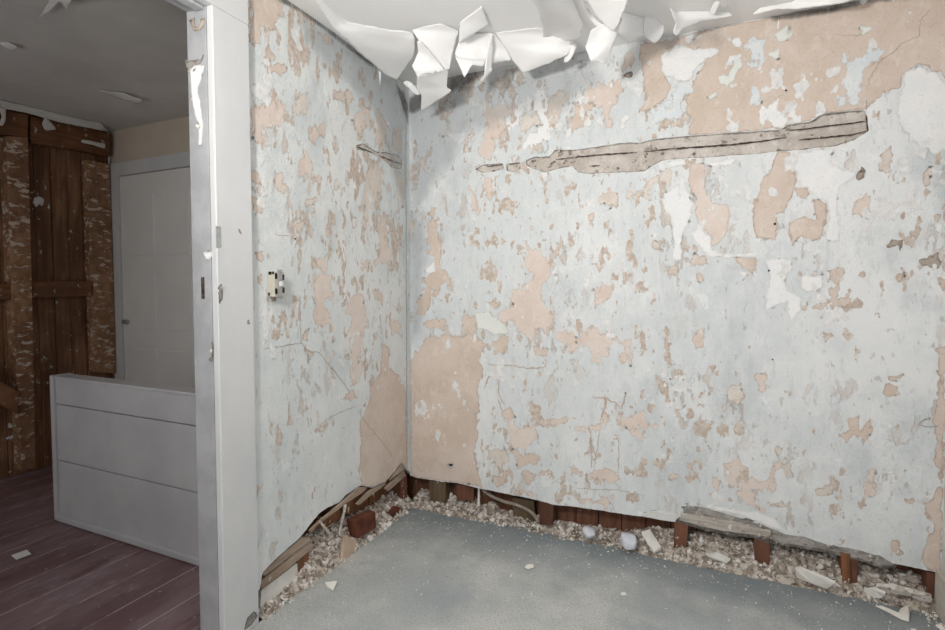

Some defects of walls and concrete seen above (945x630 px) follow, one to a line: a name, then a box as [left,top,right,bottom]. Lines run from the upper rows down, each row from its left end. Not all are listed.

peeling [40,0,71,18]
crack [812,12,928,122]
peeling [247,0,945,570]